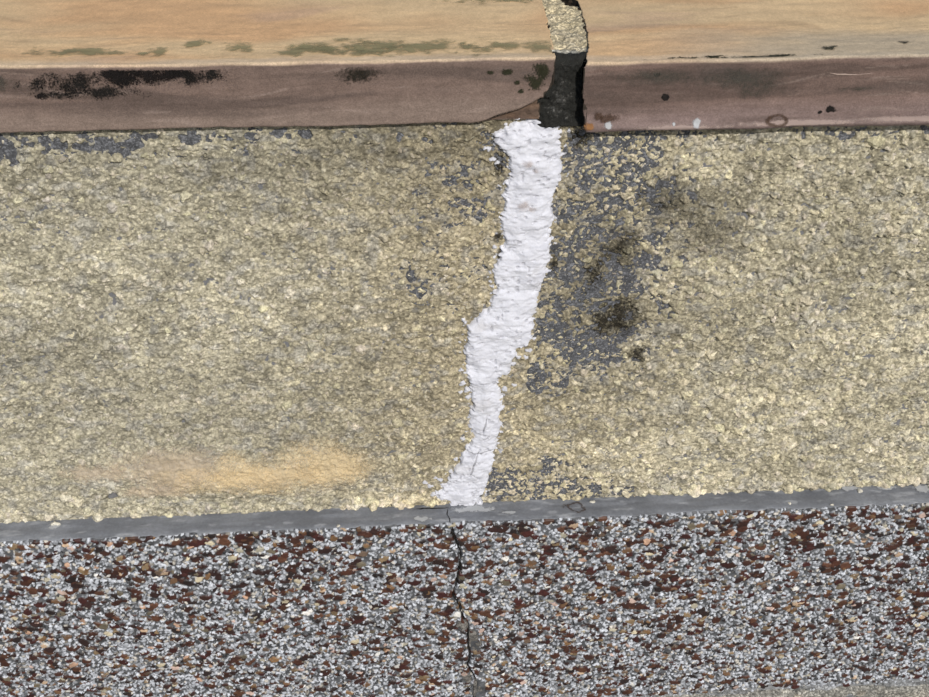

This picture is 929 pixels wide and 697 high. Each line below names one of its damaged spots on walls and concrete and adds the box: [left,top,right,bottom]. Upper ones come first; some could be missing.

crack [545,0,586,29]
water stain [16,70,222,100]
water stain [580,231,640,294]
water stain [592,293,642,337]
crack [420,507,476,697]